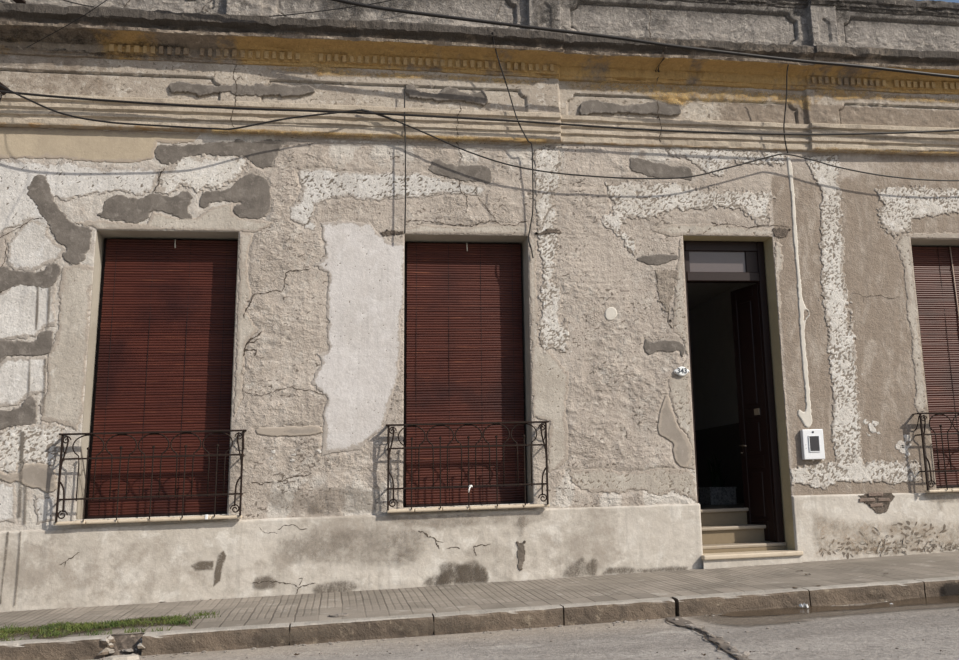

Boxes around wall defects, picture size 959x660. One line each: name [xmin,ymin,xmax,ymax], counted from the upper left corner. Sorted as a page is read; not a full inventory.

crack [241,268,324,399]
spalling [858,492,895,513]
peeling [819,521,959,559]